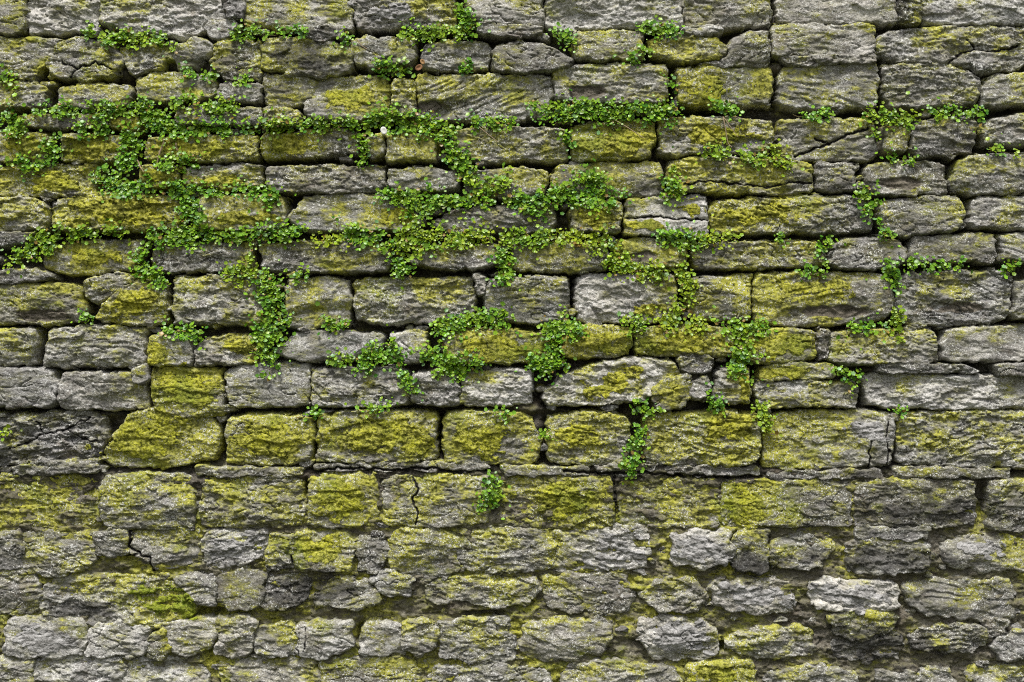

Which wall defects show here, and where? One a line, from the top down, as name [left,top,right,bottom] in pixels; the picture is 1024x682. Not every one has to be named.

crack [314,466,492,525]
crack [125,530,156,571]